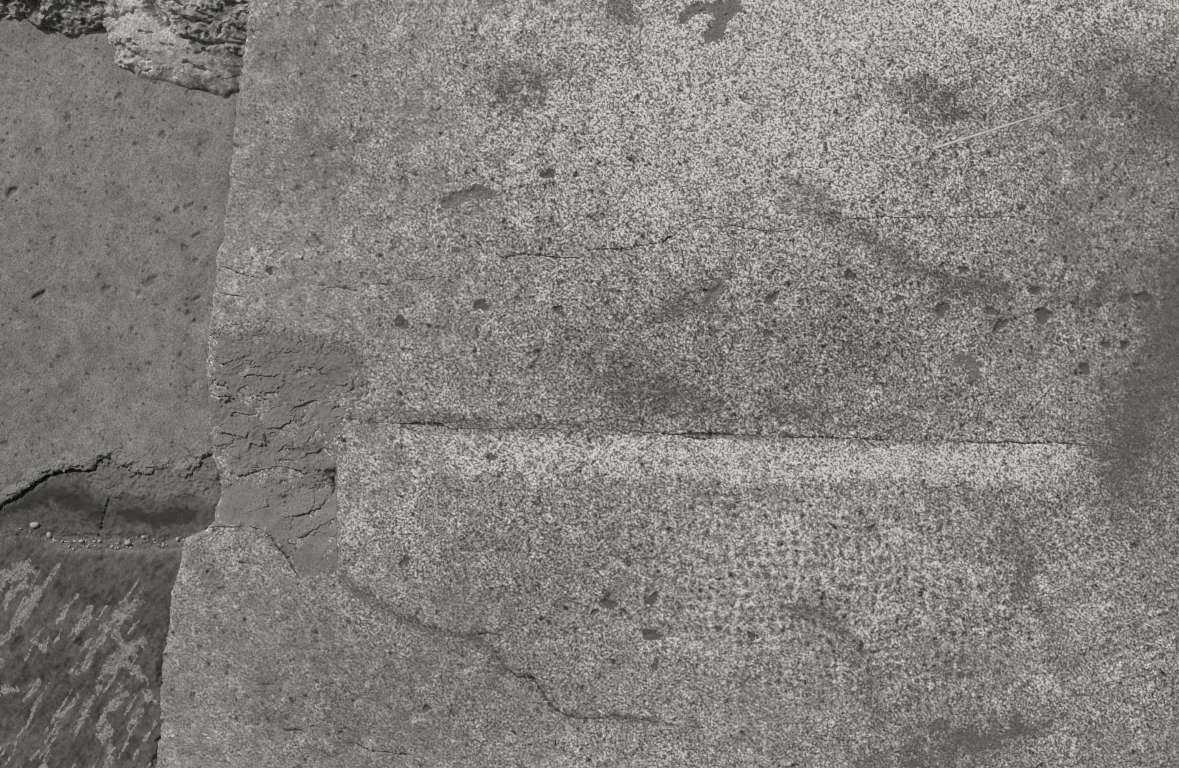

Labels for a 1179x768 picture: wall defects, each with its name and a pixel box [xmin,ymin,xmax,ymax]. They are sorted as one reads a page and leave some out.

crack [492,215,793,259]
spalling [0,319,375,572]
crack [97,494,127,544]
crack [473,631,679,752]